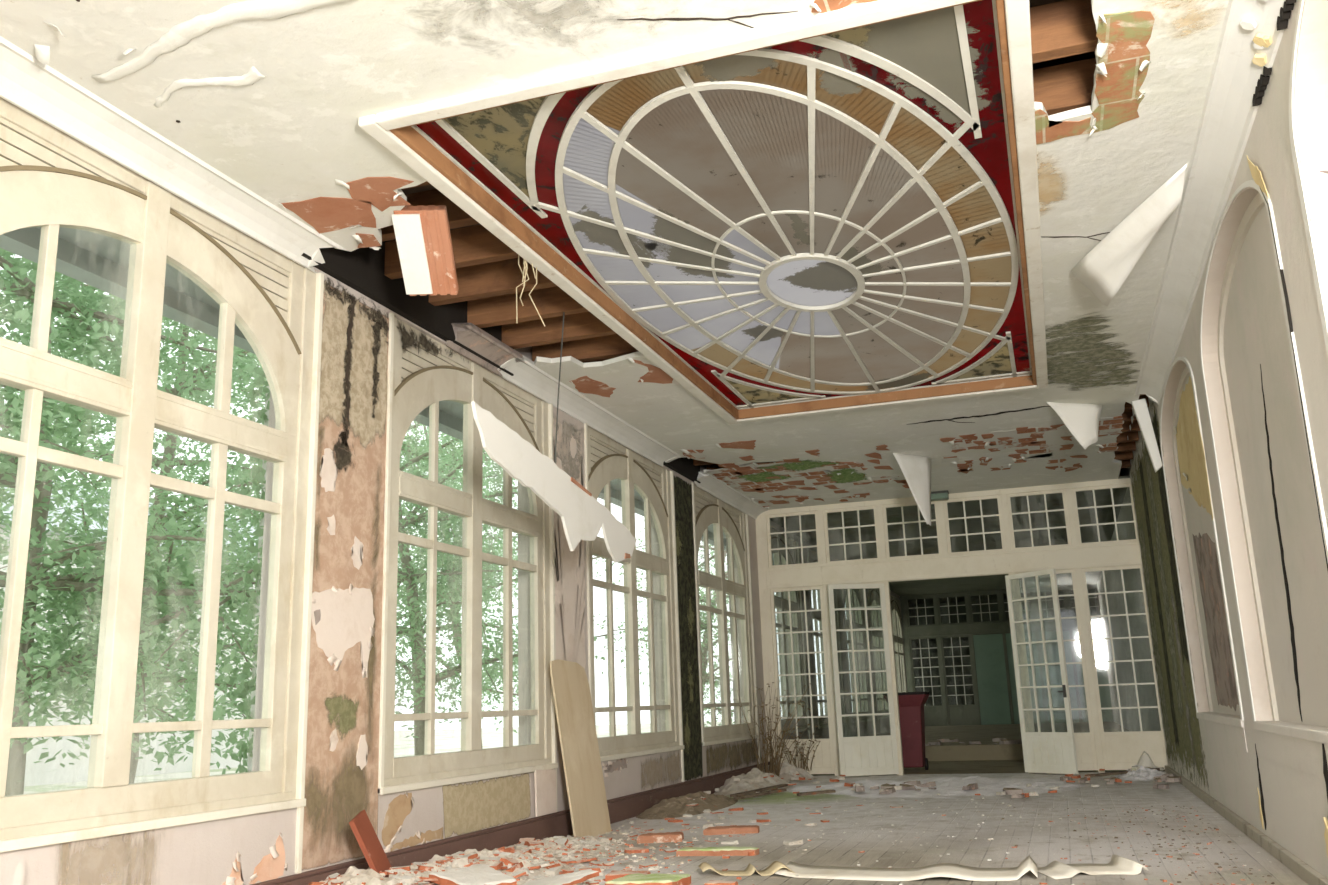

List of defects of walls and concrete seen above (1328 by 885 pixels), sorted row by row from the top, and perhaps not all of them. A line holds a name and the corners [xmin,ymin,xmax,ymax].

peeling [34,44,50,64]
water stain [505,0,596,29]
flaking render [1035,10,1155,145]
flaking render [278,177,414,250]
peeling [1071,164,1187,306]
flaking render [322,285,389,385]
water stain [1029,315,1140,391]
crack [1260,188,1328,571]
flaking render [679,402,1124,526]
flaking render [222,409,443,885]
crack [1260,364,1328,858]
crack [1255,744,1266,830]